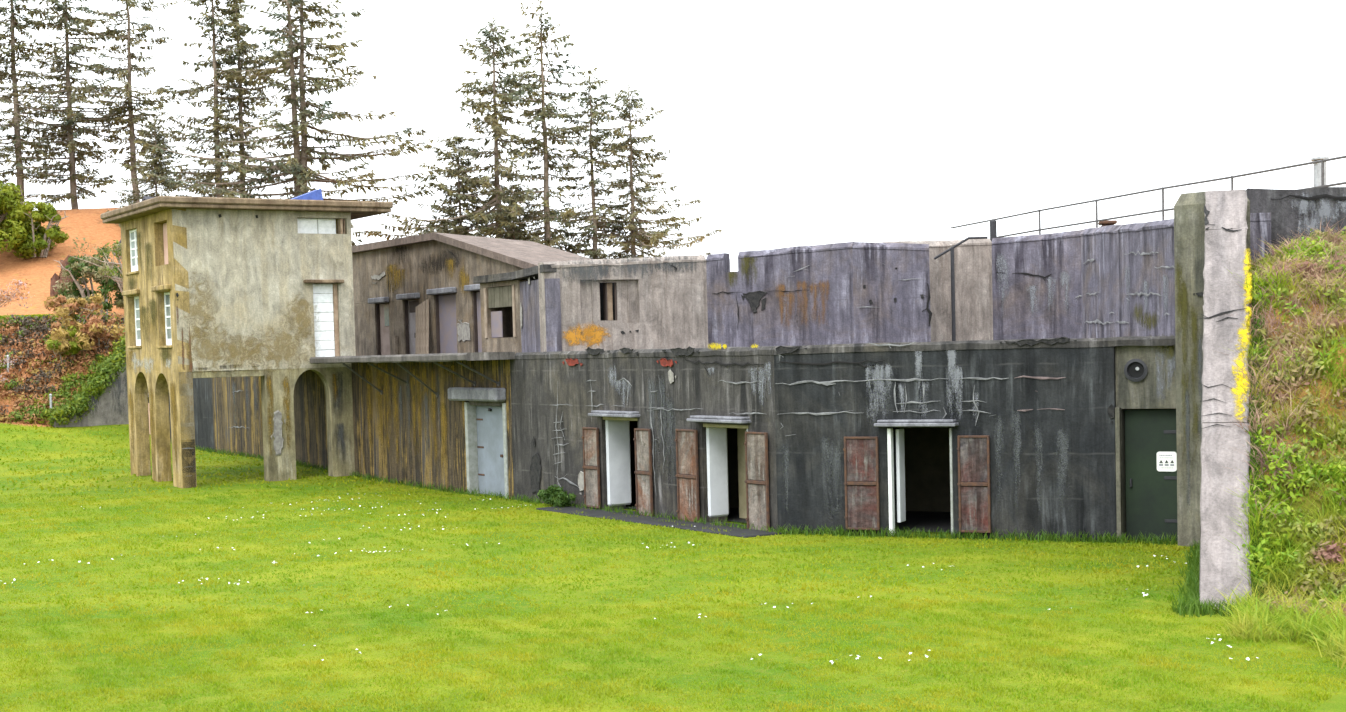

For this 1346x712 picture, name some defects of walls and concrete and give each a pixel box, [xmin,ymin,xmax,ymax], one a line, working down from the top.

water stain [866,351,927,410]